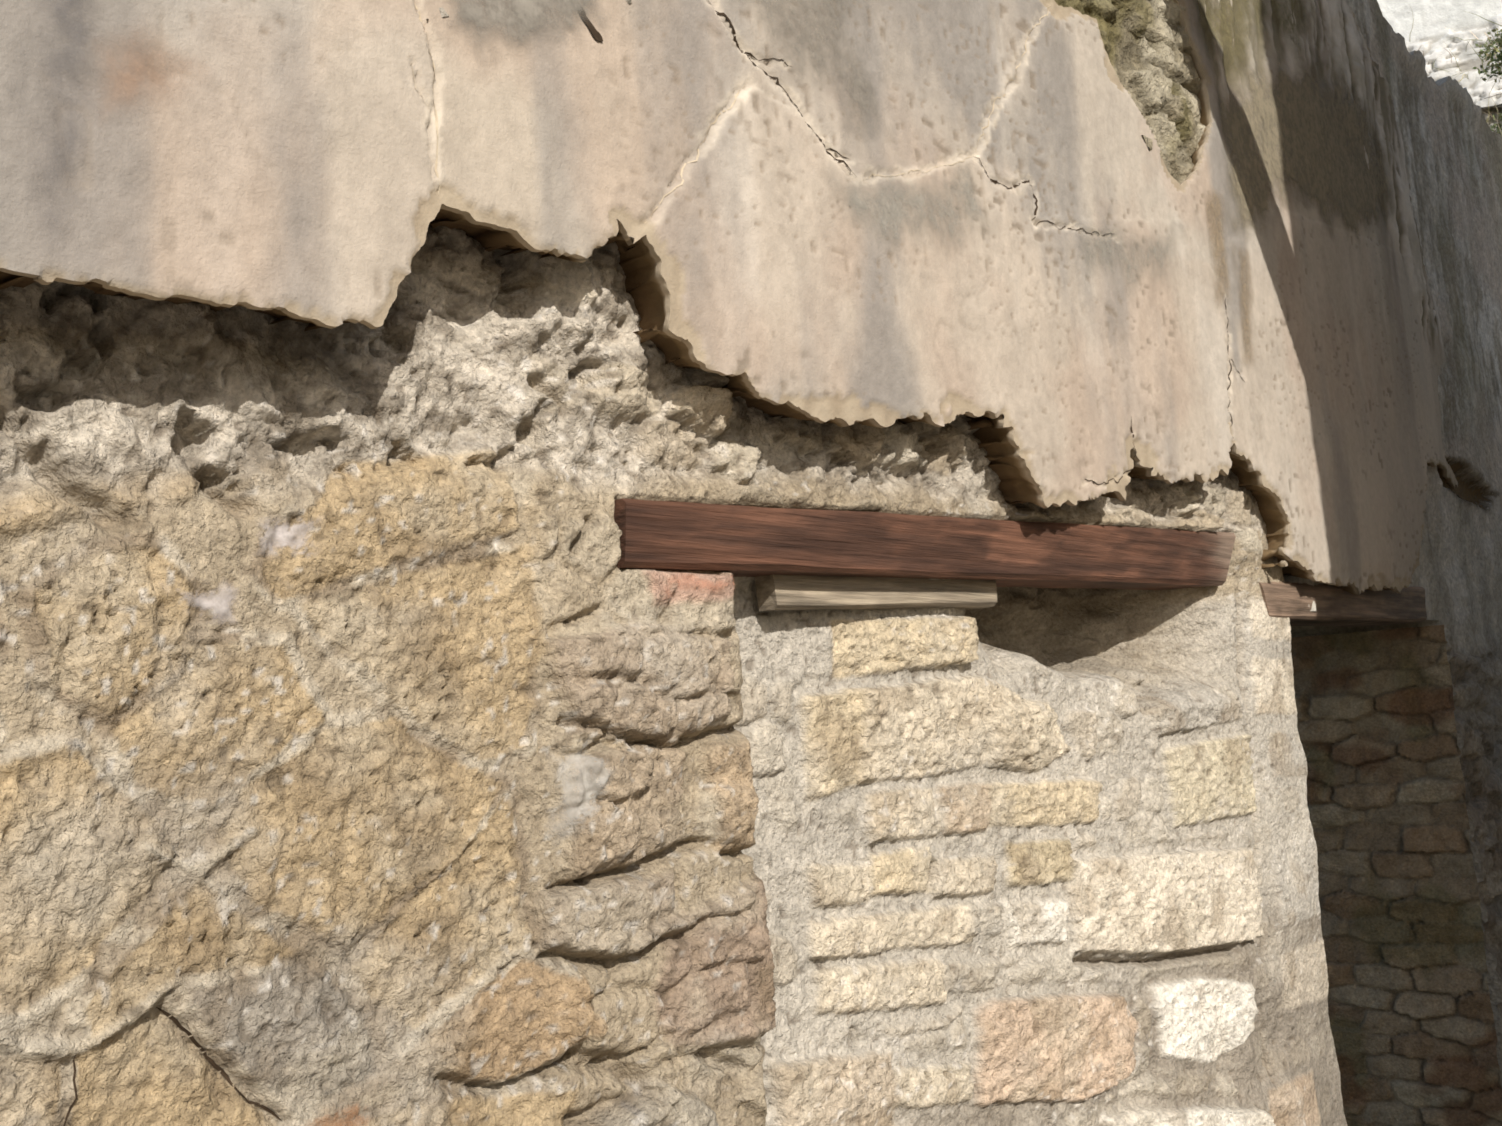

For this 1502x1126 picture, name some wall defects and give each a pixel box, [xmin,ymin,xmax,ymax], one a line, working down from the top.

crack [645,2,1114,236]
crack [1085,418,1137,485]
crack [64,1053,78,1126]
crack [156,1007,282,1121]